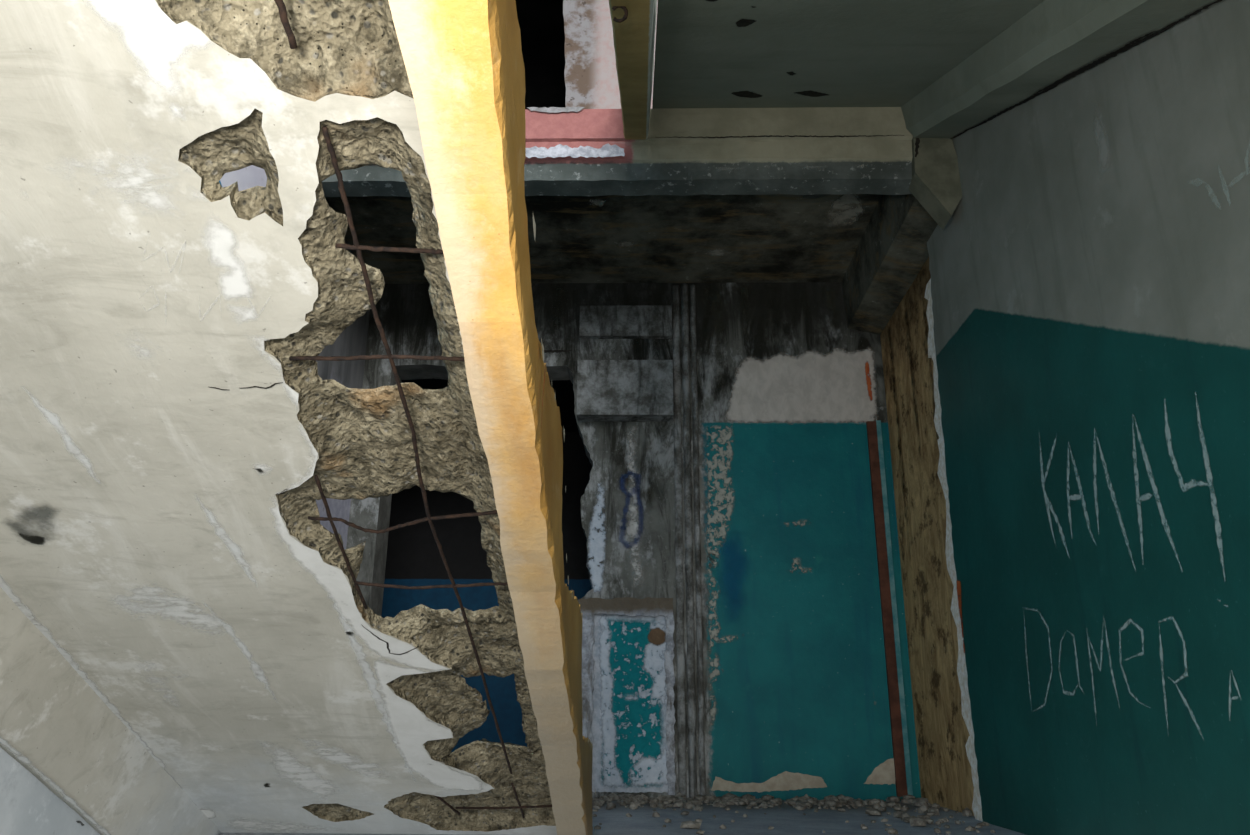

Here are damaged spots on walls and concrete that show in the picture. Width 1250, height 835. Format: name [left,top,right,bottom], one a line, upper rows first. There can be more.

spalling [89,0,412,98]
spalling [736,6,756,27]
peeling [113,164,167,208]
spalling [181,109,283,221]
peeling [526,144,625,158]
peeling [206,222,256,320]
spalling [258,117,555,829]
peeling [706,349,877,725]
peeling [581,611,668,795]
peeling [711,771,827,793]
peeling [864,758,896,785]